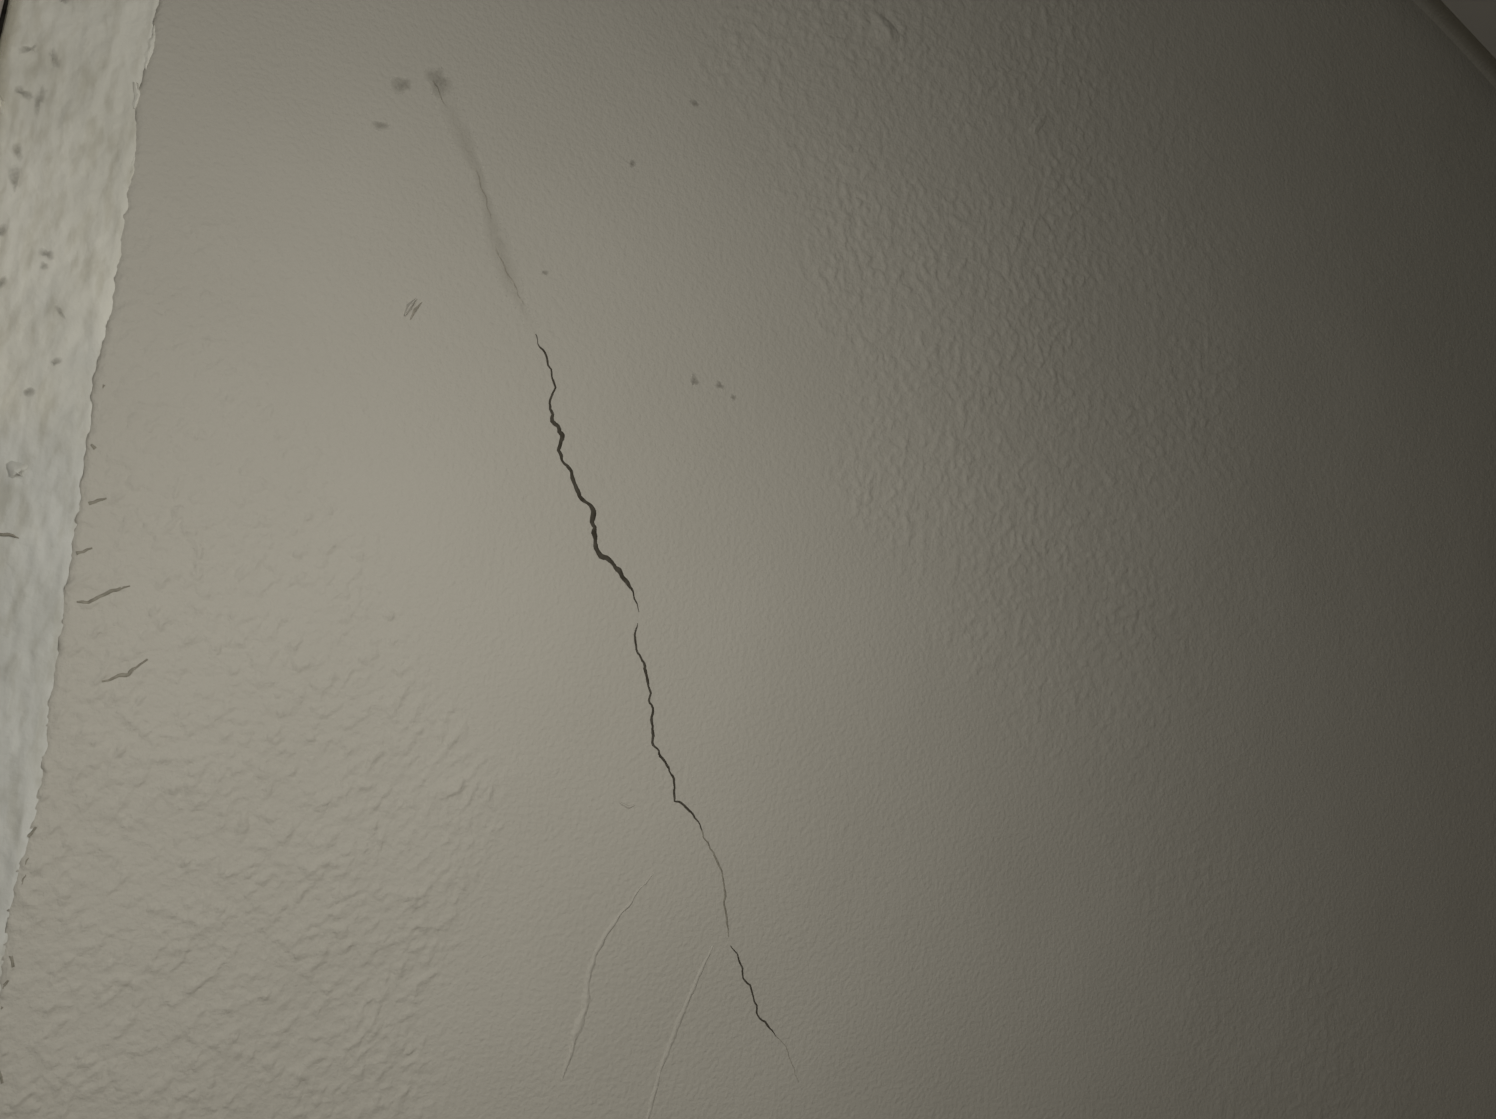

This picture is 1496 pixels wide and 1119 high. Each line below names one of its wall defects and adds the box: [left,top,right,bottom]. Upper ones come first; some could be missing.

crack [475,168,799,1083]